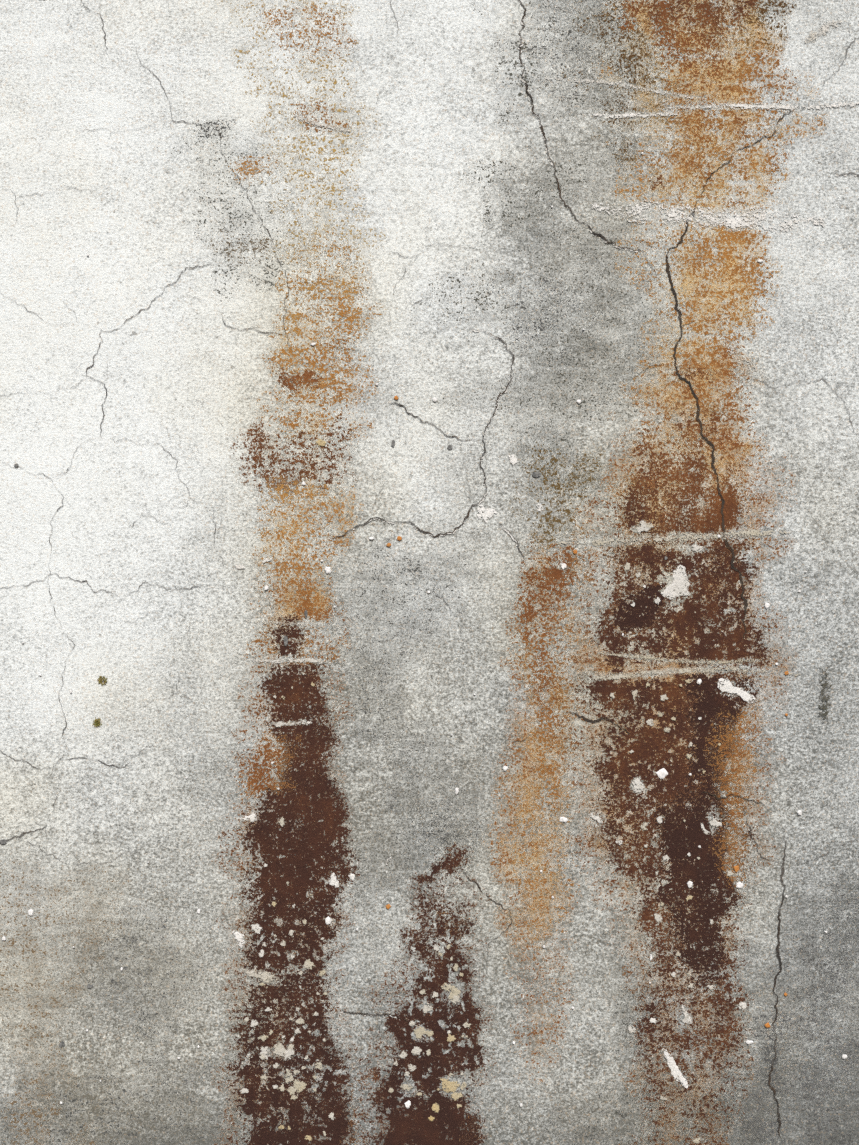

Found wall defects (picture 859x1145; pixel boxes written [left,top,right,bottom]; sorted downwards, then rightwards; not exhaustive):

crack [0,466,235,770]
crack [66,241,238,462]
crack [136,50,301,350]
crack [329,329,522,541]
crack [385,244,471,305]
crack [499,523,526,561]
rust [211,0,829,1145]
crack [518,0,830,637]
crack [6,805,89,866]